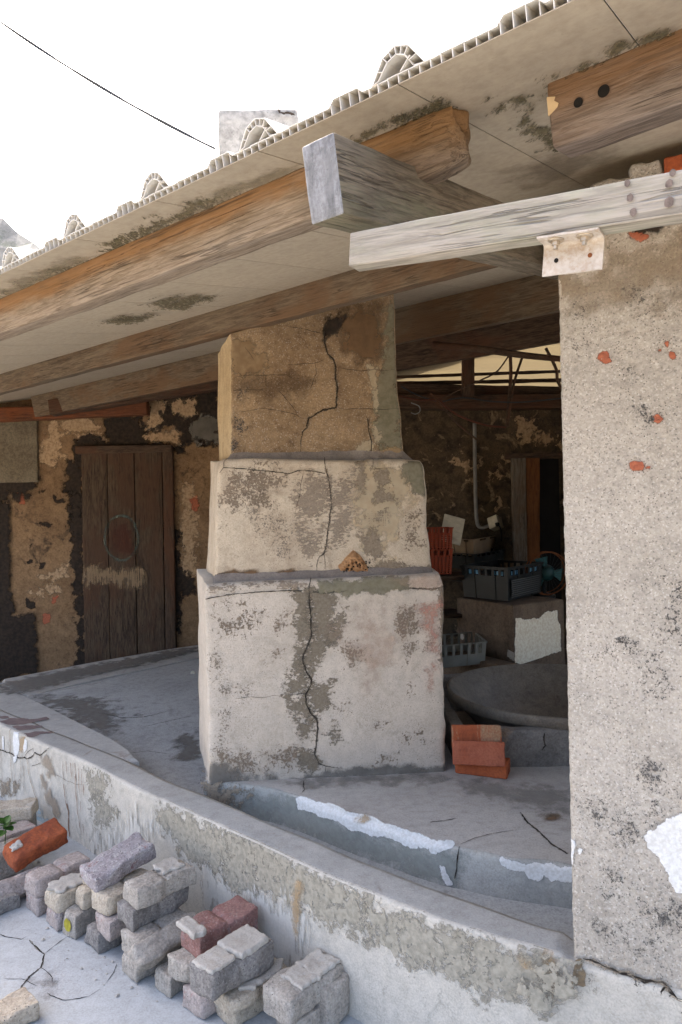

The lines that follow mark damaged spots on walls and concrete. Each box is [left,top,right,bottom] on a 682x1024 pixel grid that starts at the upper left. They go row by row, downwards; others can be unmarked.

damp [486,30,674,153]
damp [101,295,223,329]
flaking render [39,418,107,469]
flaking render [142,398,198,445]
crack [207,315,395,792]
flaking render [28,559,72,624]
crack [410,584,443,592]
damp [207,569,460,888]
damp [465,756,682,853]
crack [455,812,568,877]
flaking render [155,796,586,1010]
crack [0,934,117,1002]